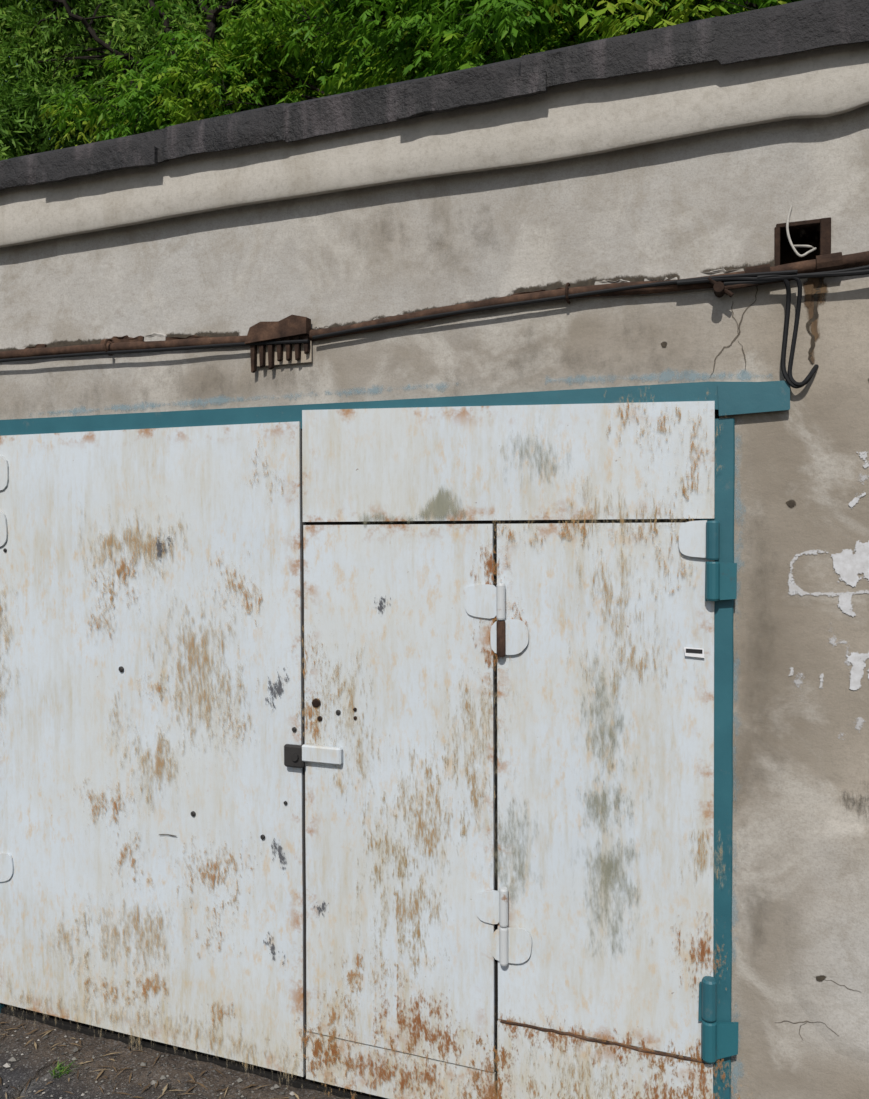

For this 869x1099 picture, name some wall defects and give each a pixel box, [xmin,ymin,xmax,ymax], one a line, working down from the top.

crack [710,286,758,377]
rust [88,518,184,636]
rust [559,407,717,714]
peeling [837,592,856,617]
rust [152,606,250,738]
rust [265,668,290,708]
rust [89,785,152,882]
rust [367,757,449,878]
rust [57,900,168,1046]
rust [170,884,464,1099]
rust [672,912,728,986]
rust [462,1016,740,1099]